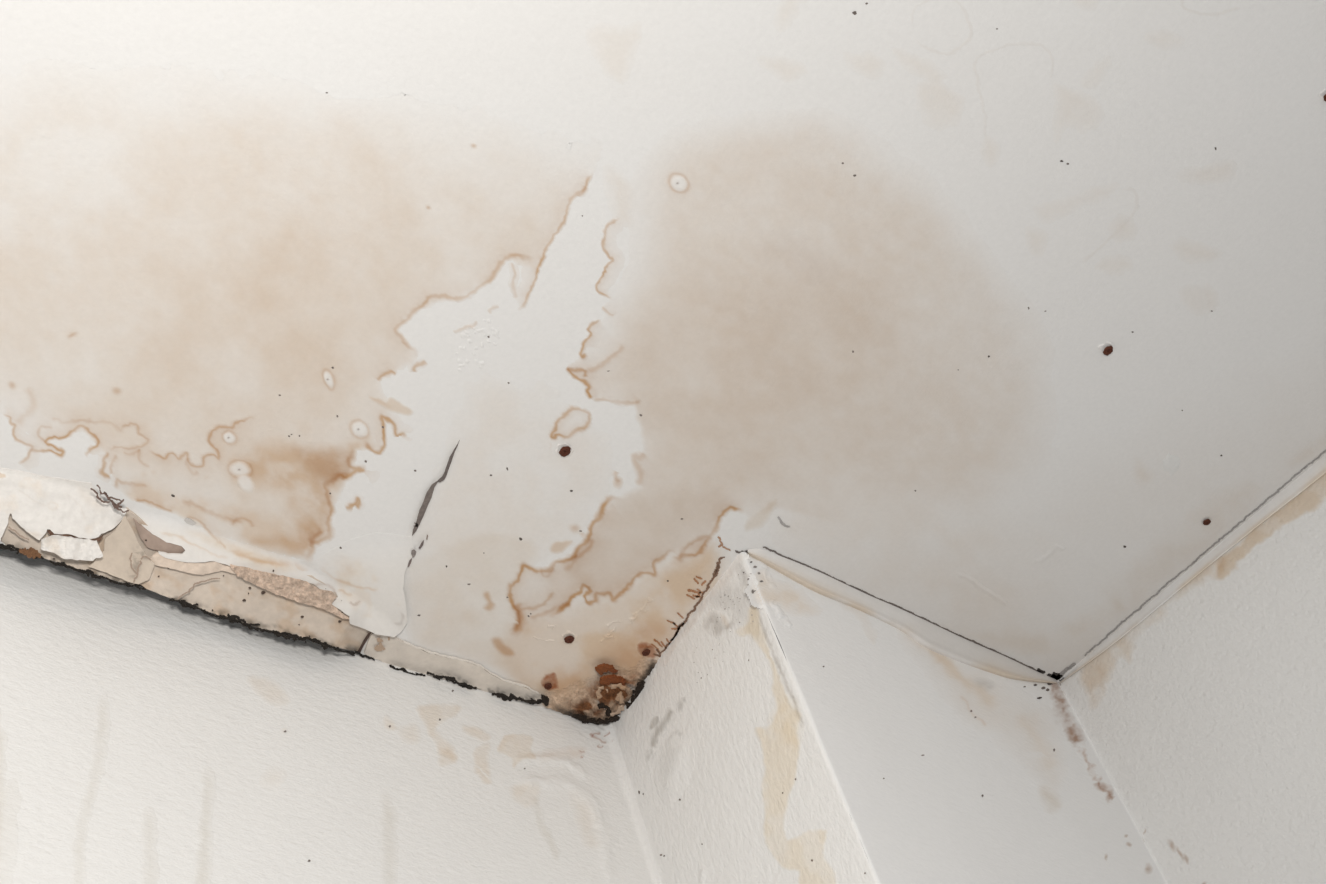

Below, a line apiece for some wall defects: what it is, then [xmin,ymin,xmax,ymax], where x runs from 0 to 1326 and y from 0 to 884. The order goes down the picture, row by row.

water stain [0,55,1326,711]
water stain [382,703,587,862]
corrosion [491,536,749,725]
water stain [645,696,687,763]
water stain [702,564,1069,884]